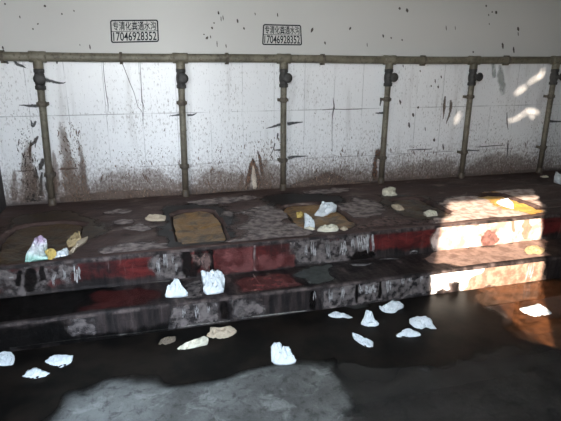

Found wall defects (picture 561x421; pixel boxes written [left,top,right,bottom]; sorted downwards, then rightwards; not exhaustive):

water stain [14,128,43,202]
rust [52,131,88,199]
water stain [57,122,182,202]
rust [237,151,272,190]
water stain [191,137,371,206]
peeling [191,205,372,318]
water stain [0,264,561,421]